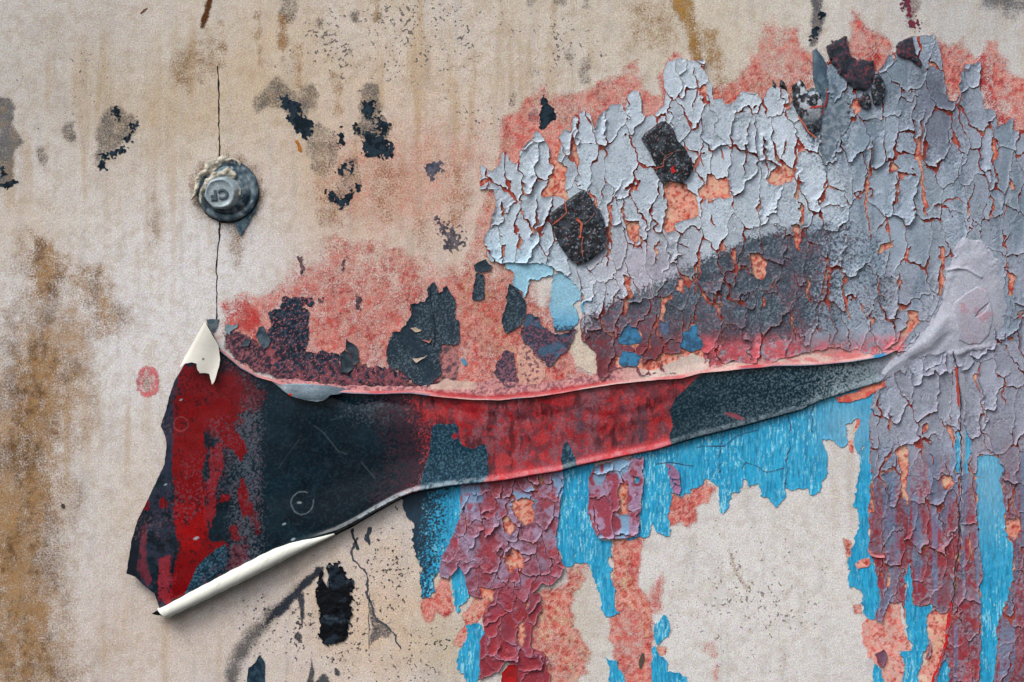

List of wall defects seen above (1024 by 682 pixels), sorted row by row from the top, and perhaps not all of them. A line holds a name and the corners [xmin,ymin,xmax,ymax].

crack [215,66,223,156]
crack [214,222,222,319]
peeling [241,326,271,349]
peeling [340,339,359,373]
peeling [472,0,1024,682]
spalling [315,561,355,646]
crack [350,528,401,649]
peeling [439,471,565,682]